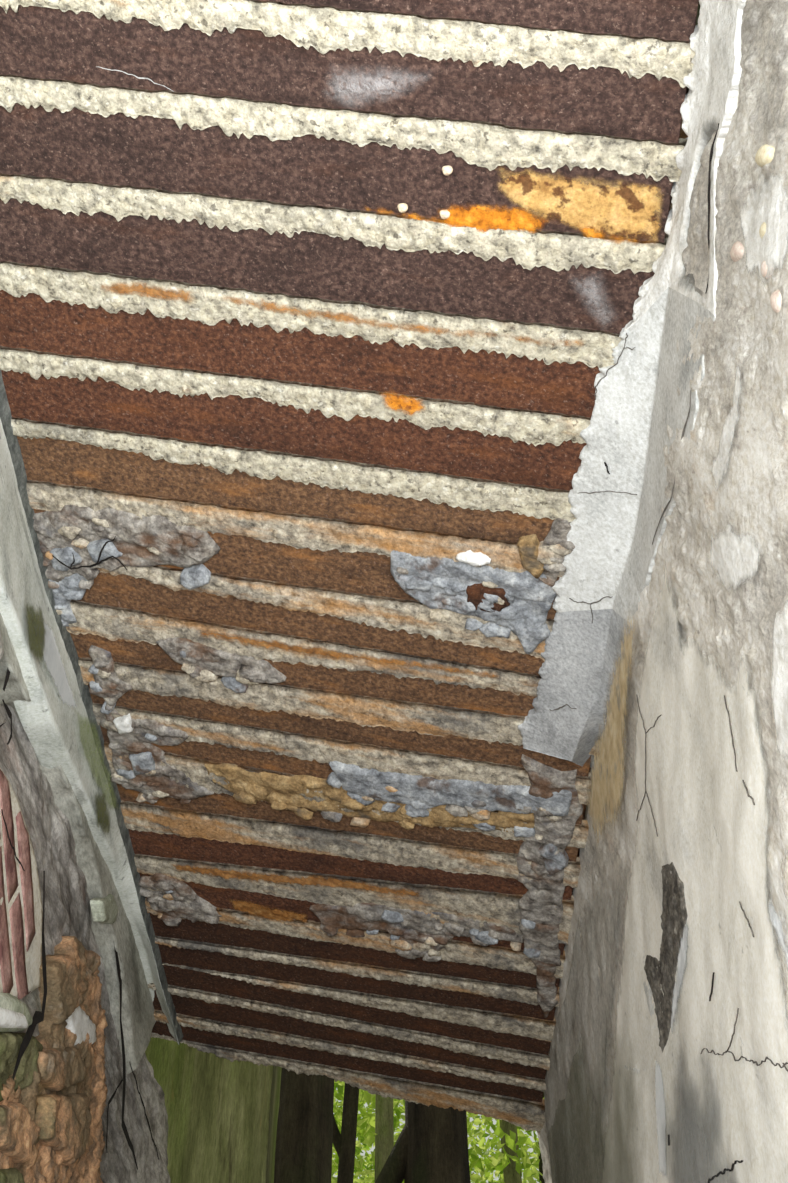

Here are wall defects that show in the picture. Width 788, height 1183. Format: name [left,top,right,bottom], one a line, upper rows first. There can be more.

corrosion [409,172,660,240]
corrosion [103,284,189,301]
corrosion [227,297,443,334]
spalling [390,518,575,655]
corrosion [466,583,510,612]
crack [0,669,12,745]
crack [724,695,755,805]
spalling [88,637,583,1018]
spalling [0,768,108,1183]
flaking render [643,862,688,1052]
crack [701,1008,788,1071]
crack [708,1160,744,1183]